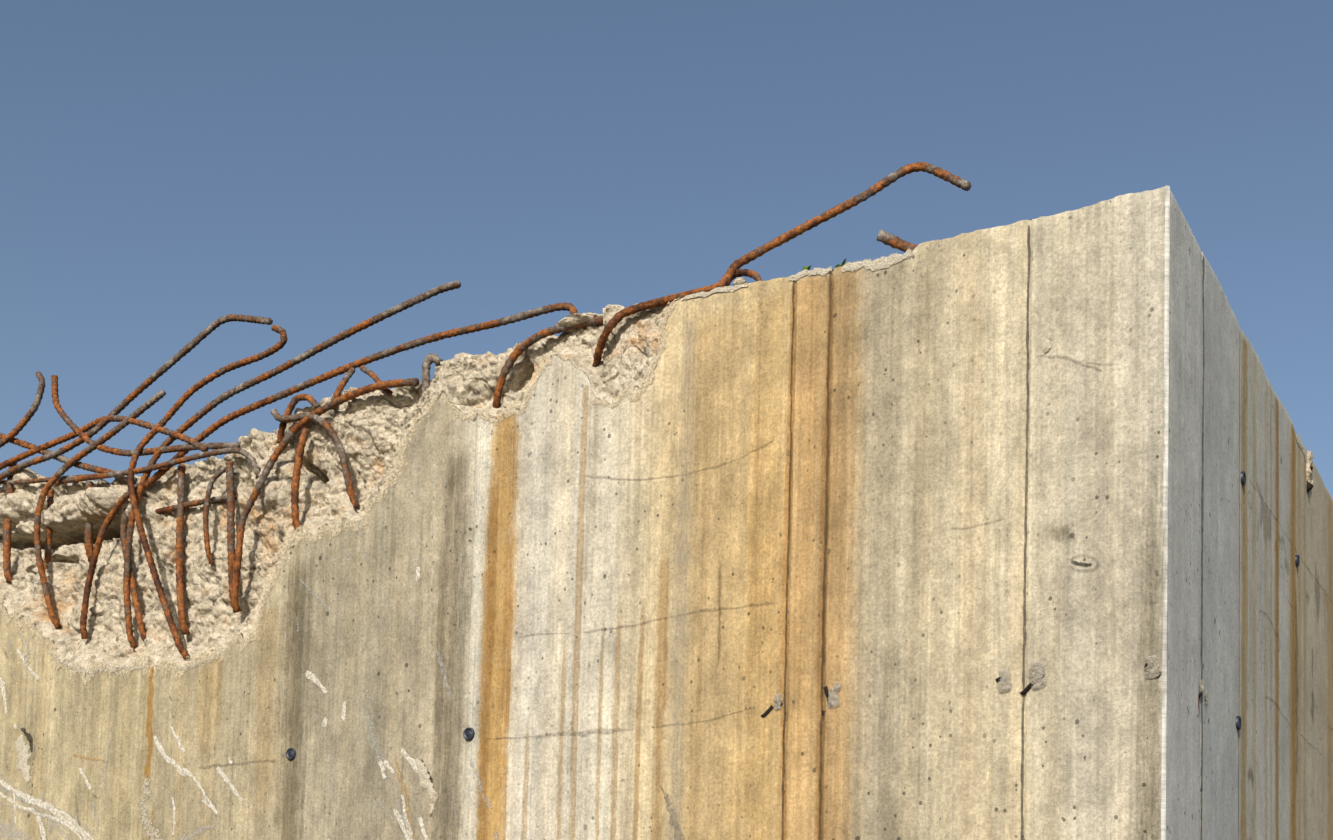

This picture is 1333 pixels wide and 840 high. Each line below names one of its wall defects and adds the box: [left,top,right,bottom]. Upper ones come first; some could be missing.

spalling [0,162,971,685]